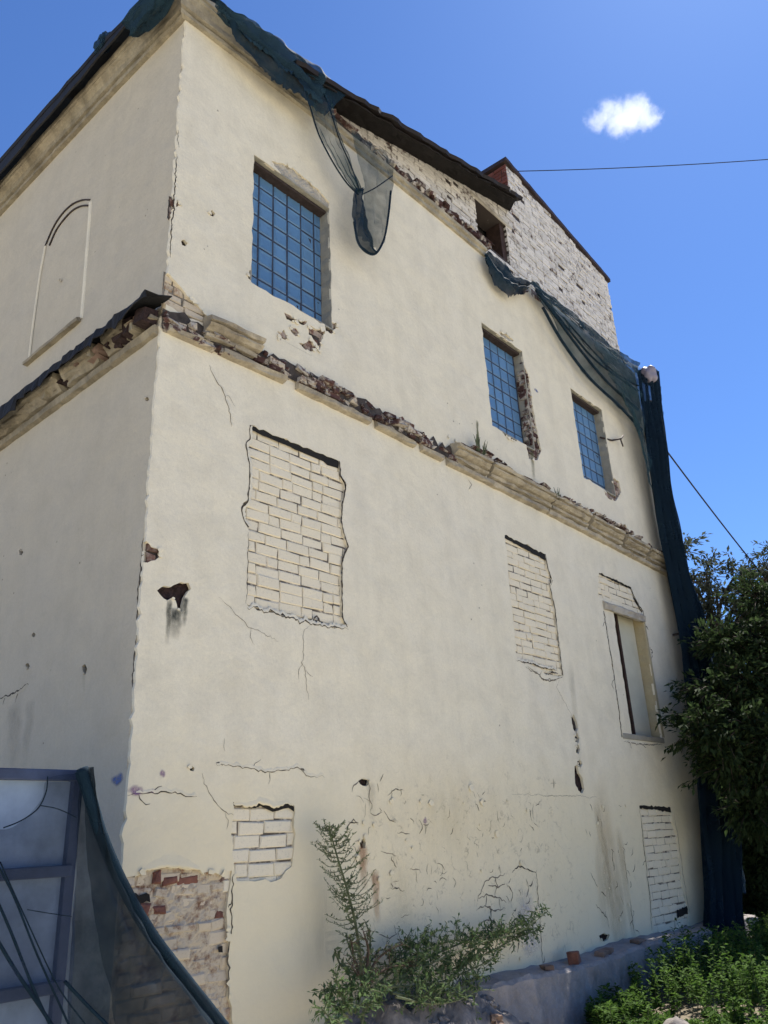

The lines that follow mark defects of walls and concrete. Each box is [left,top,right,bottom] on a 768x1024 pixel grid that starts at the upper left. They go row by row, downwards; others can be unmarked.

crack [170,131,179,258]
flaking render [277,314,339,353]
flaking render [253,350,512,469]
crack [210,365,350,698]
hole [157,583,189,611]
crack [127,738,324,827]
crack [345,775,653,963]
flaking render [127,863,239,1024]